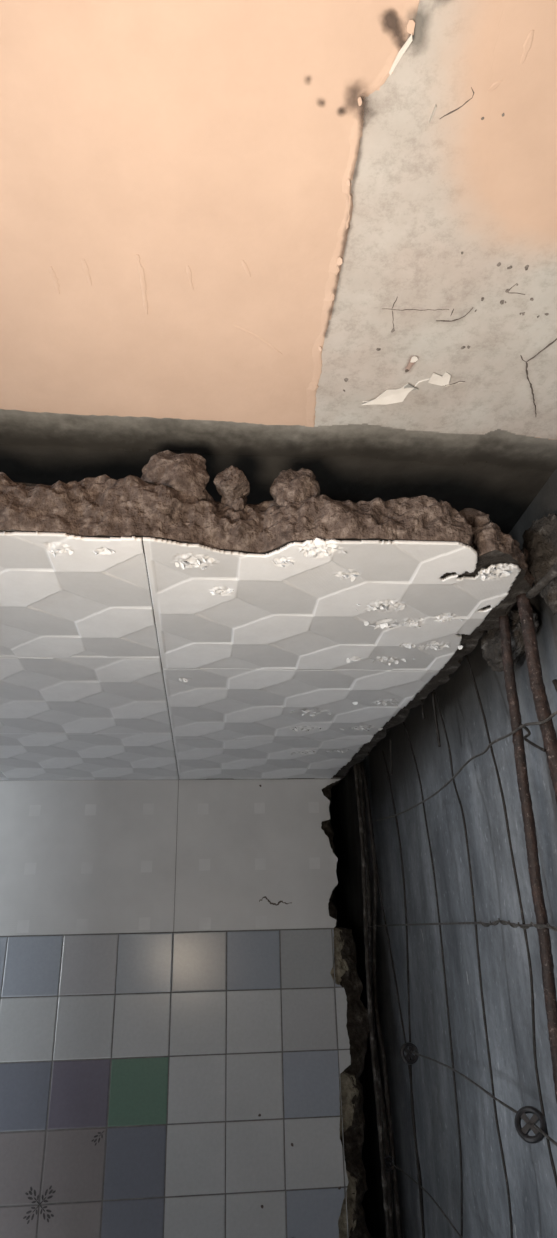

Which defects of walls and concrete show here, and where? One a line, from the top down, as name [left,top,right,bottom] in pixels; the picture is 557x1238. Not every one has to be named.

peeling [305,0,557,440]
crack [520,338,557,414]
spalling [321,780,340,854]
spalling [328,885,371,1238]